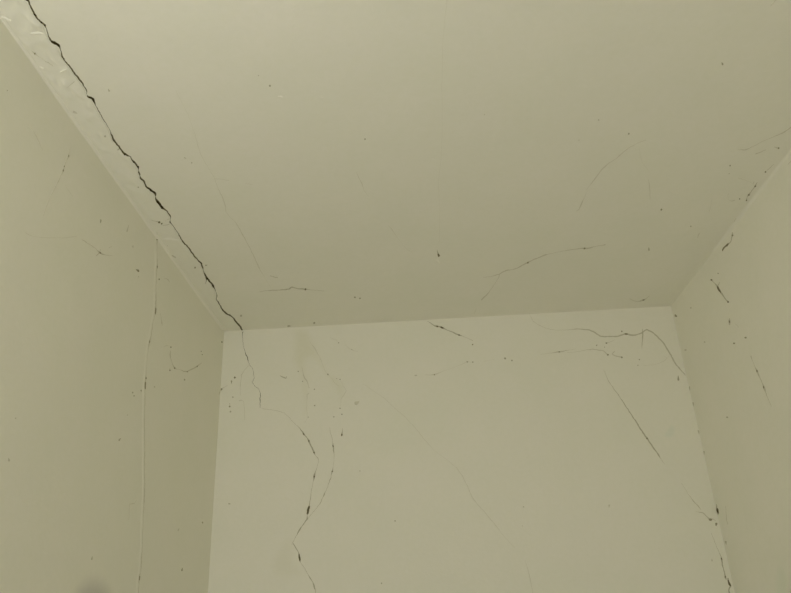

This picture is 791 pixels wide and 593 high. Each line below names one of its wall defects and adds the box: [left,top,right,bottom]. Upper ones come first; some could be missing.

crack [26,0,354,593]
crack [533,321,685,463]
crack [681,483,731,593]